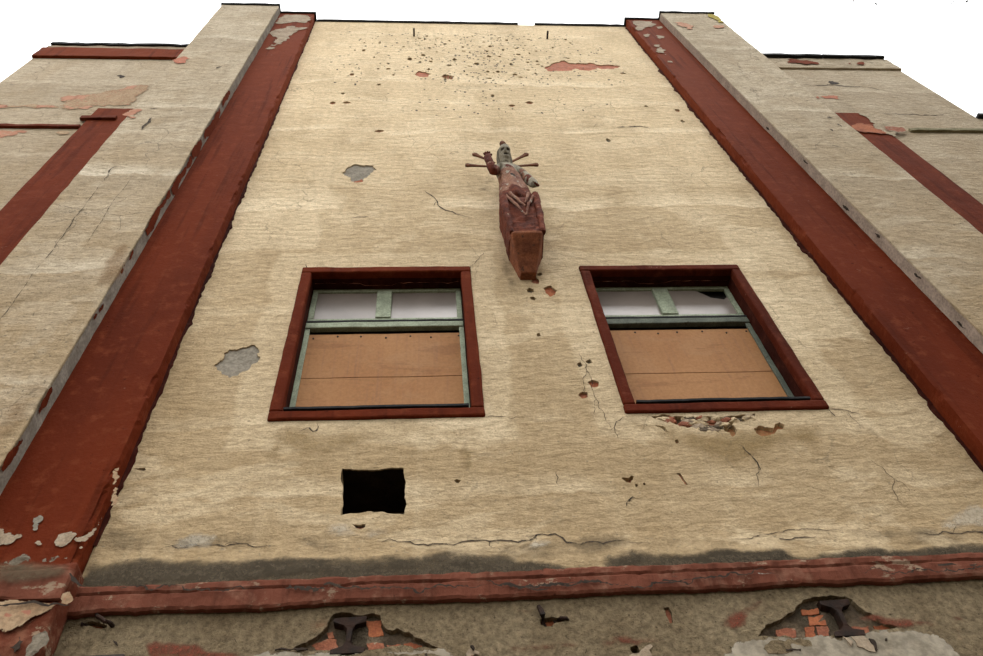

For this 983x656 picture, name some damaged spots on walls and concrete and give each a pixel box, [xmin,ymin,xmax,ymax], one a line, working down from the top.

peeling [265,14,310,49]
spalling [355,33,624,117]
peeling [343,165,375,183]
crack [579,354,628,441]
spalling [656,414,783,436]
peeling [0,529,22,545]
peeling [42,524,99,562]
crack [382,533,651,548]
crack [748,528,841,540]
crack [925,527,983,535]
flaking render [0,592,73,656]
spalling [760,599,890,638]